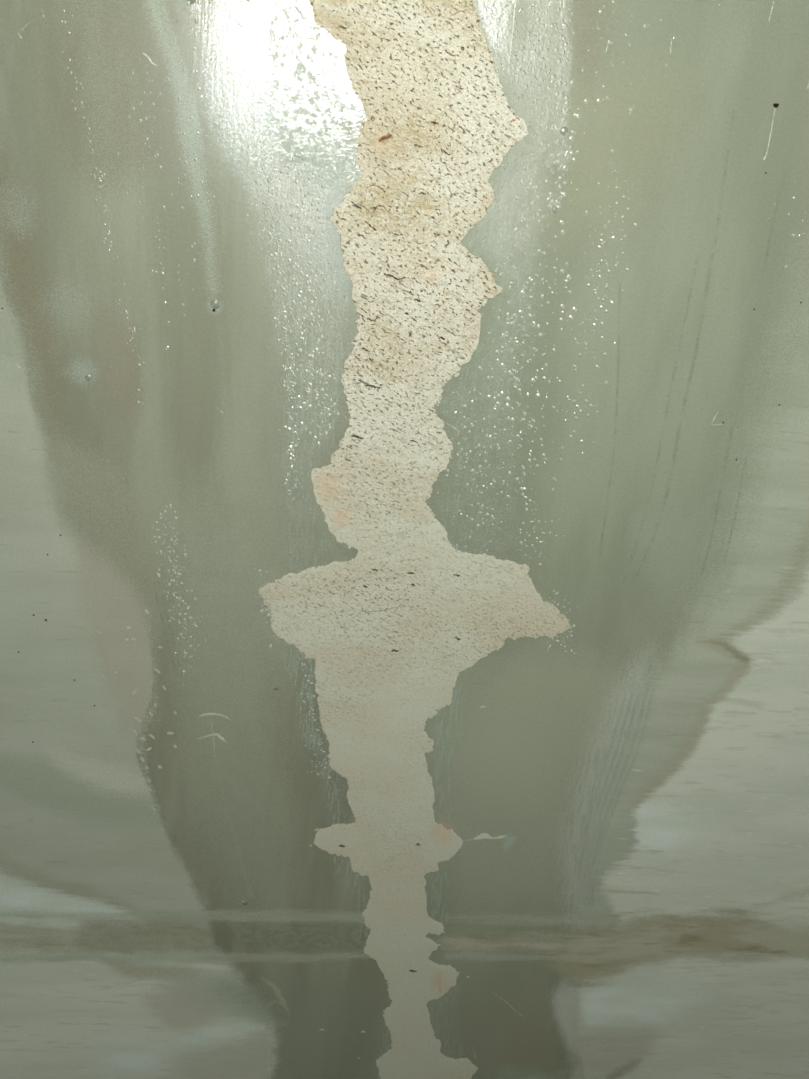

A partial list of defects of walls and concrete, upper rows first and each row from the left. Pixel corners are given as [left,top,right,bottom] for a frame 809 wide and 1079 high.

water stain [0,0,392,1079]
peeling [258,0,573,1079]
water stain [424,0,809,1079]